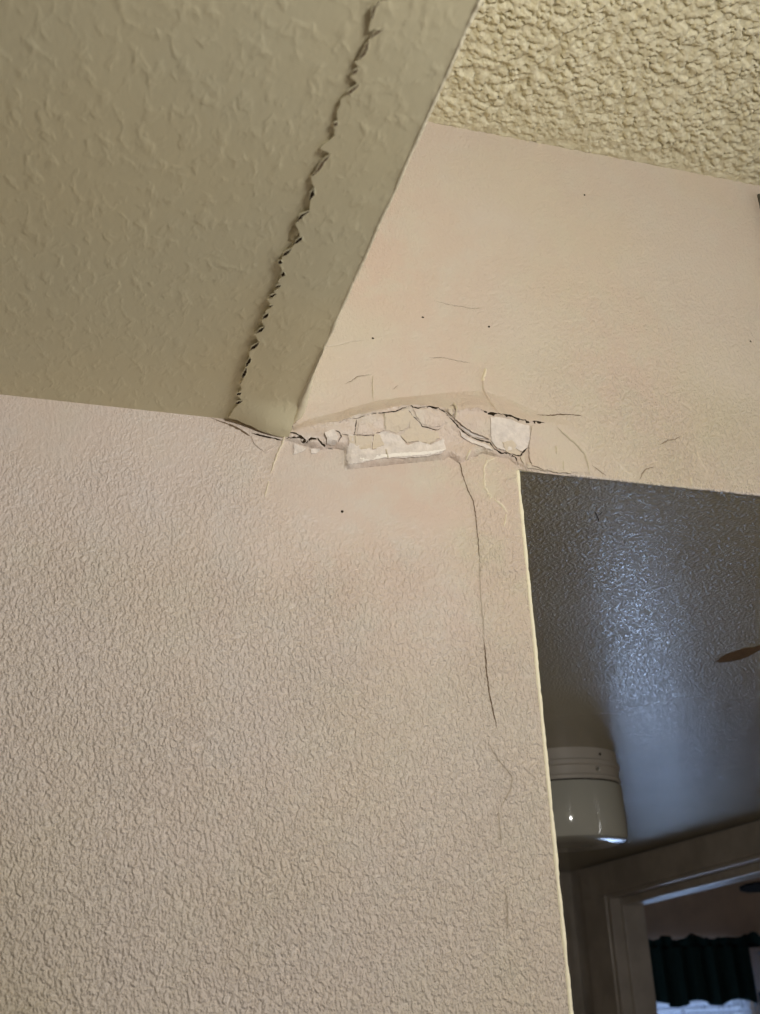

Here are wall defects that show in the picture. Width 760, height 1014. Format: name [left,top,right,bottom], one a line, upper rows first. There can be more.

crack [228,0,582,845]
spalling [293,368,590,526]
peeling [716,645,760,663]
crack [503,888,511,929]